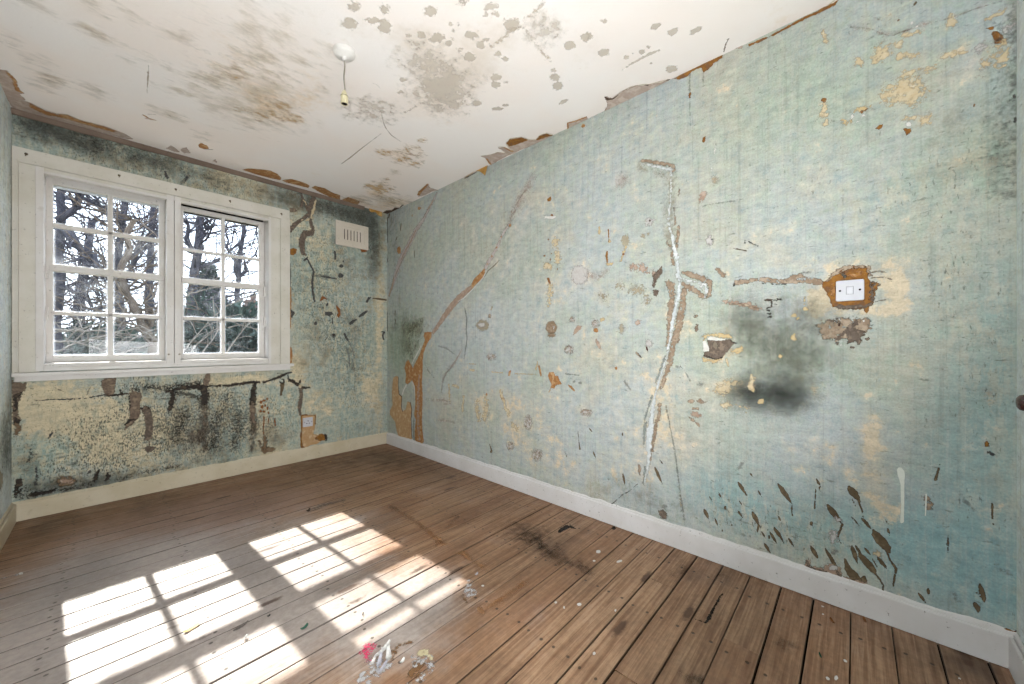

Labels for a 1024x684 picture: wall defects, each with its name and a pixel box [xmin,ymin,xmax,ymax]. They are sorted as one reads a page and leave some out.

water stain [400,22,509,112]
water stain [550,68,567,104]
water stain [564,32,592,50]
flaking render [674,55,723,80]
flaking render [735,0,838,49]
peeling [975,23,1016,69]
flaking render [815,265,892,349]
flaking render [694,315,764,408]
flaking render [100,378,155,453]
water stain [258,436,275,454]
flaking render [300,414,328,448]
water stain [0,448,182,501]